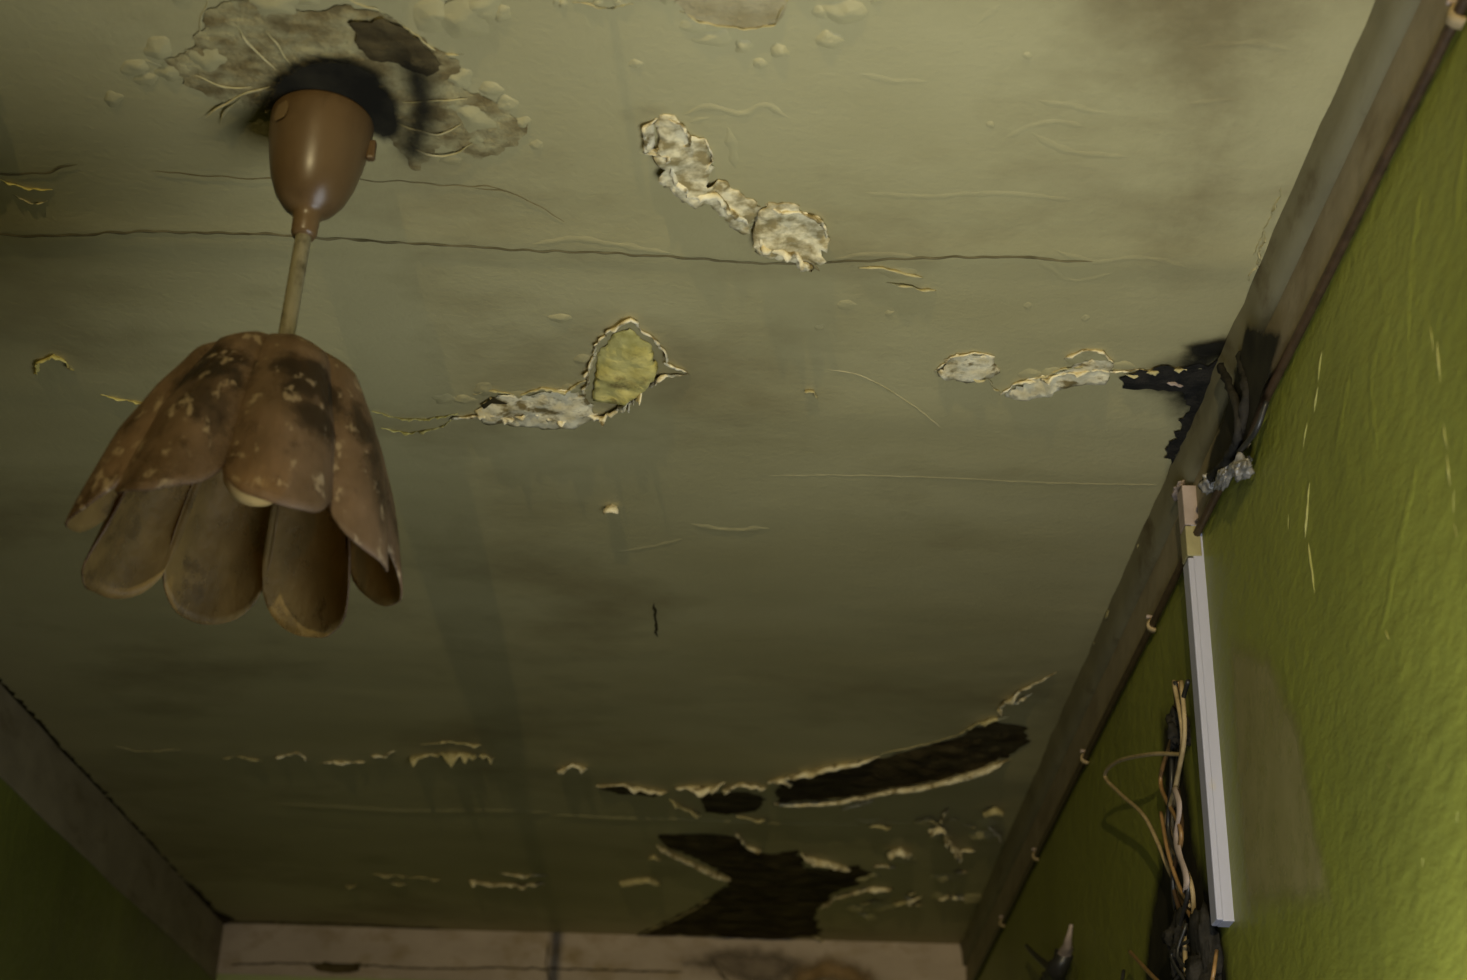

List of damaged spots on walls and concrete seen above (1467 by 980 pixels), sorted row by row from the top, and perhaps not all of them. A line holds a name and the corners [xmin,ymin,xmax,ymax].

peeling [0,179,52,205]
peeling [641,114,831,272]
peeling [858,266,936,292]
peeling [372,318,690,436]
peeling [935,349,1144,401]
peeling [222,741,496,769]
peeling [557,763,588,775]
spalling [596,672,1057,943]
damp [710,953,870,980]